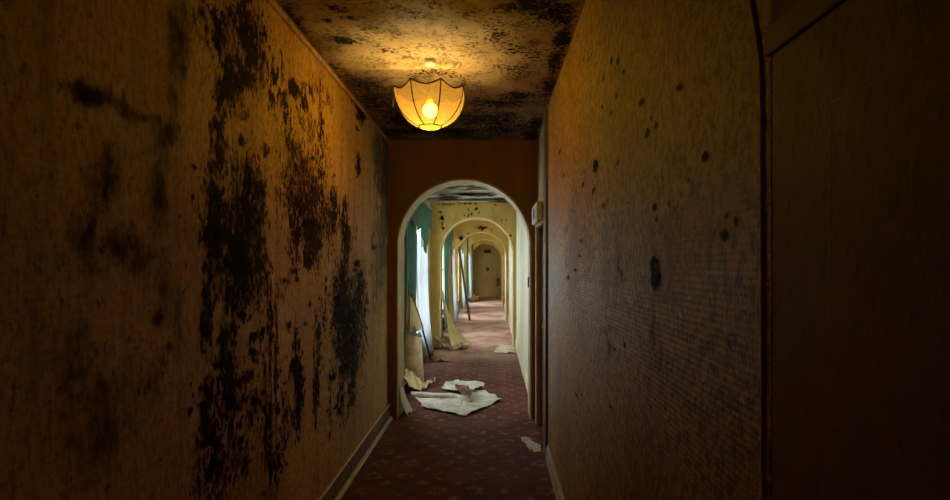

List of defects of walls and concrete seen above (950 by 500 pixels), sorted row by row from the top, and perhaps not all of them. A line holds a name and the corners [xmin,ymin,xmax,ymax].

water stain [185,0,579,500]
water stain [565,182,738,312]
peeling [442,290,471,347]